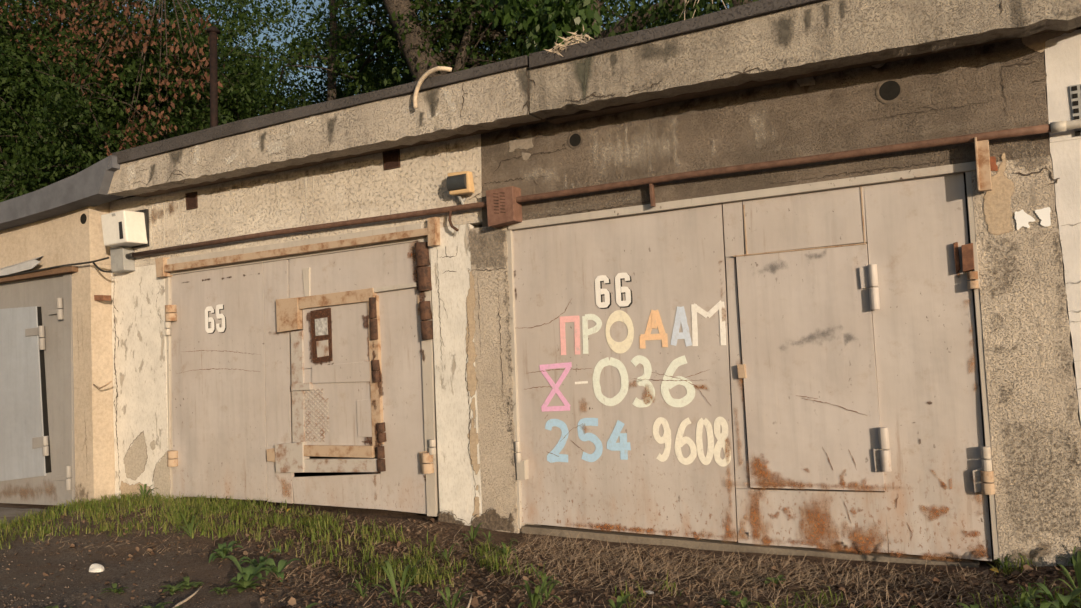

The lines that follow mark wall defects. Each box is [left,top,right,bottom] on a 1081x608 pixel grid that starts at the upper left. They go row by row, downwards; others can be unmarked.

damp [776,17,792,45]
damp [805,1,845,28]
spalling [990,142,1048,171]
peeling [120,431,171,499]
corrosion [723,439,808,544]
corrosion [775,503,882,554]